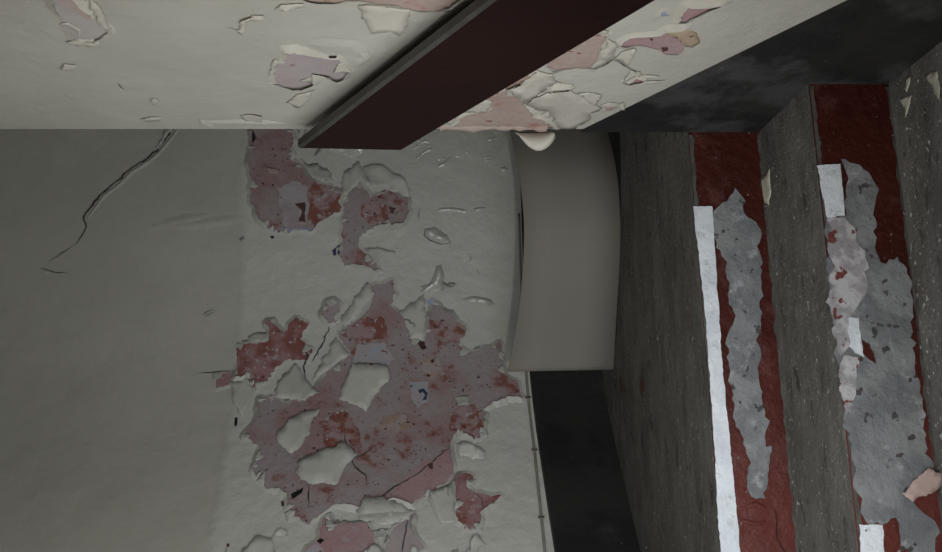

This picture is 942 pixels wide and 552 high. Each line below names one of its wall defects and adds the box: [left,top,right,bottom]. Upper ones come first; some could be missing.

peeling [42,0,116,48]
peeling [268,44,356,109]
peeling [274,0,474,36]
peeling [440,0,733,151]
crack [49,129,179,262]
peeling [204,129,526,552]
peeling [713,188,772,499]
peeling [824,159,942,552]